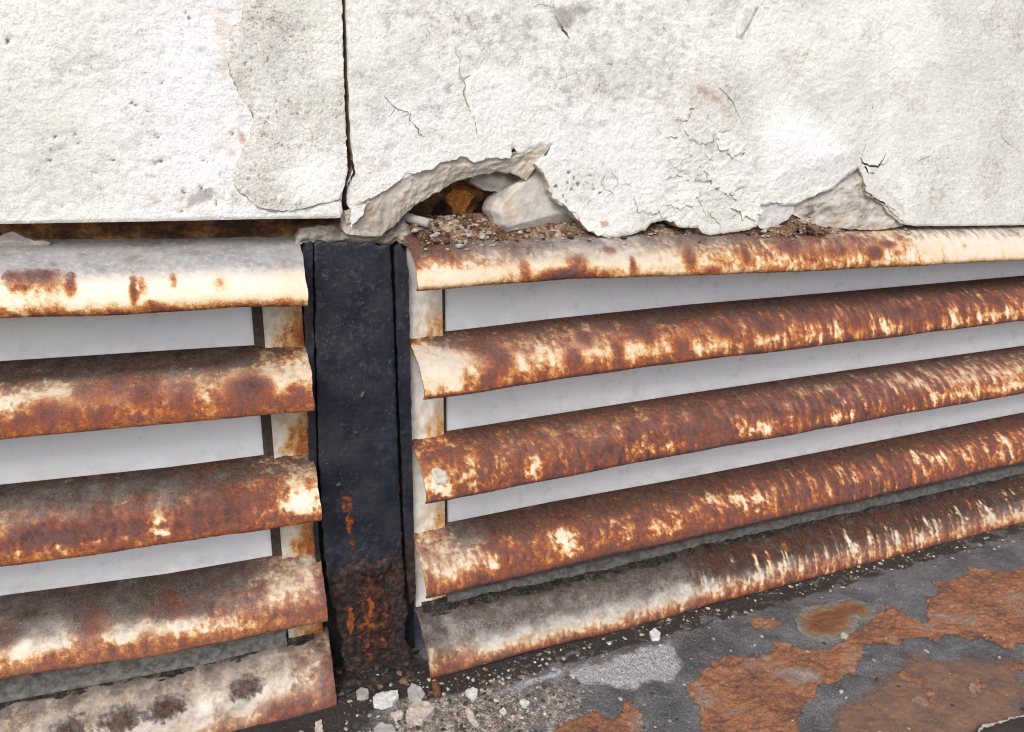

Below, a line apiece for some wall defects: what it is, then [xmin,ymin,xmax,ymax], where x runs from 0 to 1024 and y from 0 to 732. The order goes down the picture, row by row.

crack [326,0,355,223]
crack [384,96,422,135]
peeling [228,0,606,237]
crack [456,54,479,136]
peeling [633,93,903,230]
crack [860,144,904,223]
corrosion [341,496,395,659]
corrosion [685,565,1024,732]